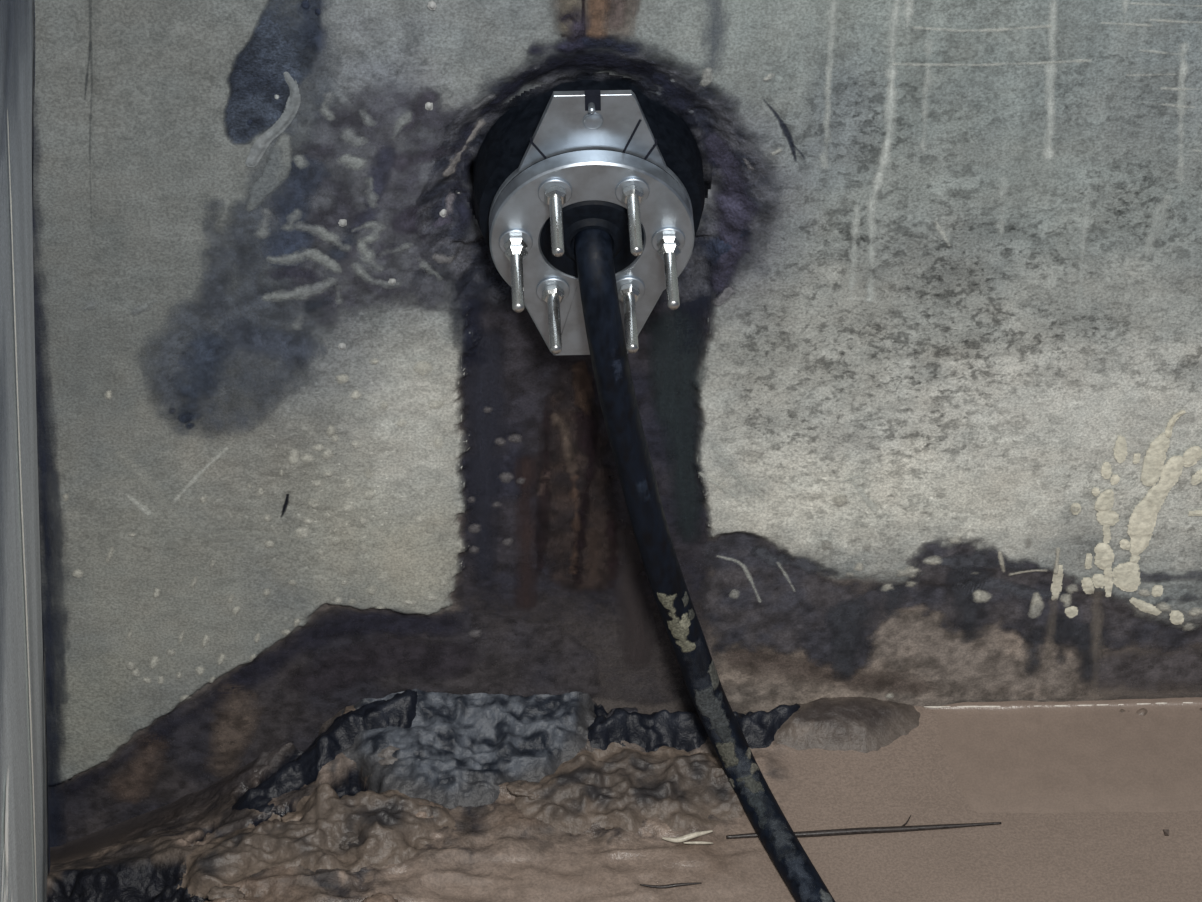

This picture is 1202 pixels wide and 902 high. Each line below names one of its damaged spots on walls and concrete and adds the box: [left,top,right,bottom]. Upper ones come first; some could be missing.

corrosion [555,0,636,40]
water stain [850,0,912,288]
water stain [1045,2,1056,159]
water stain [1179,44,1187,114]
water stain [33,0,666,902]
water stain [628,265,1202,715]